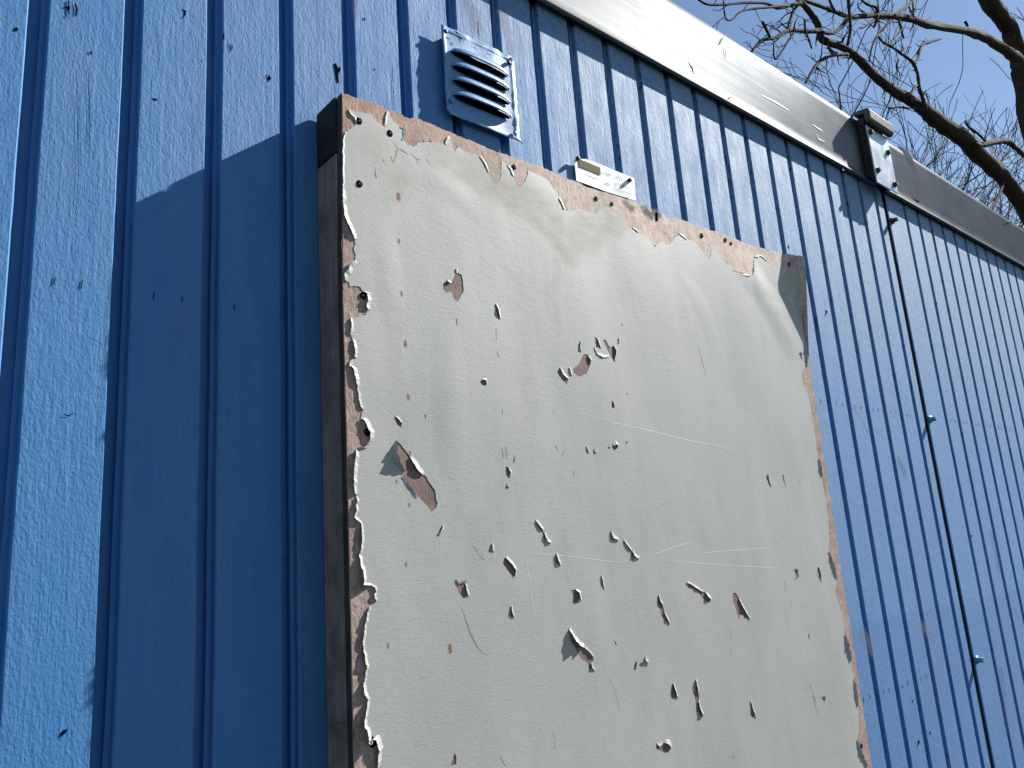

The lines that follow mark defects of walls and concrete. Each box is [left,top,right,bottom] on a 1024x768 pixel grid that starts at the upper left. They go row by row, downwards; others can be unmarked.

peeling [334,63,806,768]
peeling [799,317,872,768]